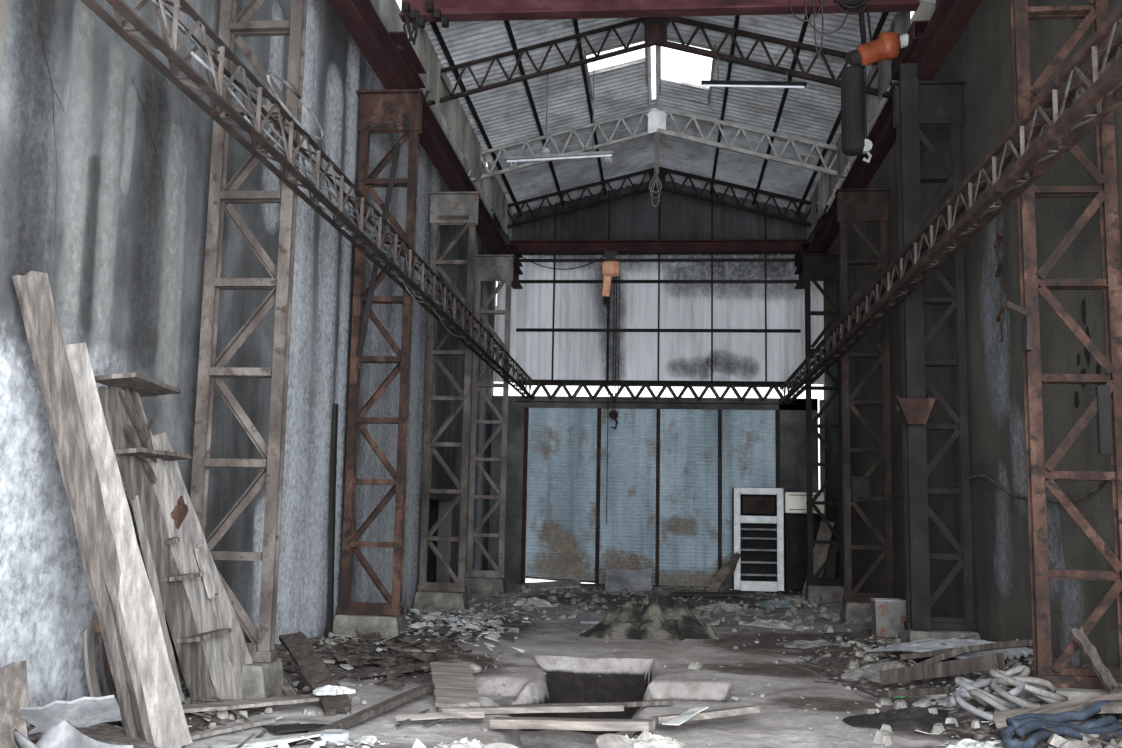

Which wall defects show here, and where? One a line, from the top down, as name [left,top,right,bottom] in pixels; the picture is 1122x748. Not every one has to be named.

leakage [18,0,51,264]
leakage [59,5,186,397]
leakage [597,277,623,379]
leakage [616,253,793,293]
leakage [672,355,753,375]
leakage [980,202,1027,597]
leakage [0,350,115,707]
leakage [123,486,150,583]
corrosion [533,522,730,589]
leakage [1046,496,1083,667]